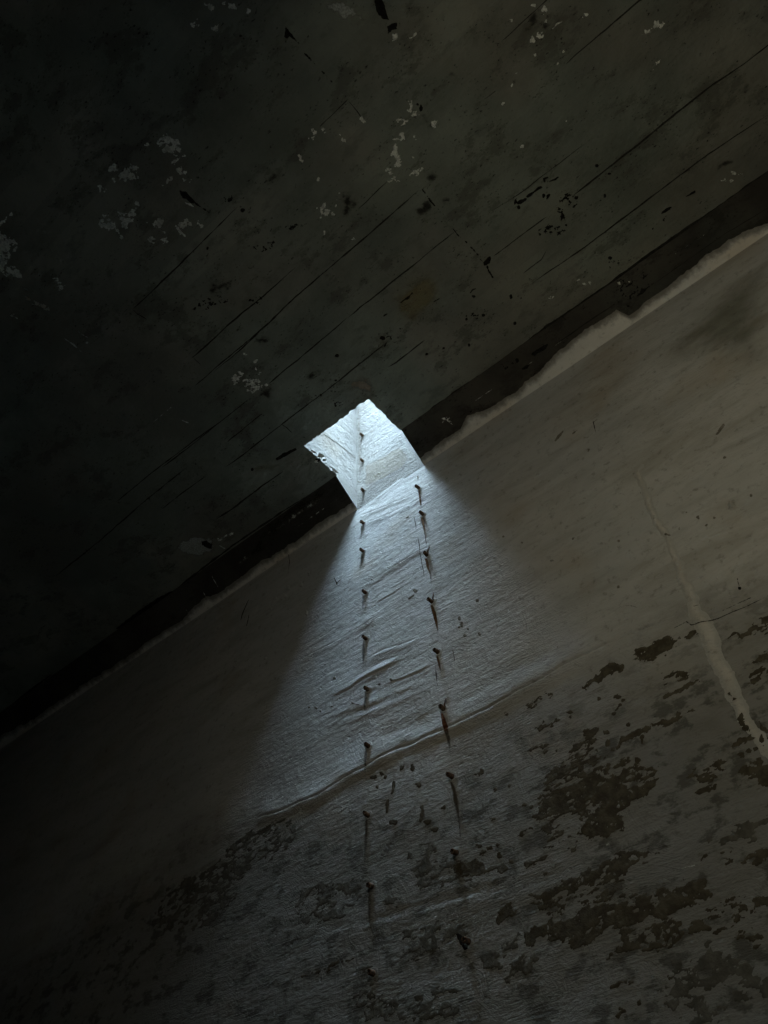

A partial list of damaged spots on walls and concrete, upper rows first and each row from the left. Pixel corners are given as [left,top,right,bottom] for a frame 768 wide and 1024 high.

crack [675,597,765,628]
peeling [582,630,700,716]
peeling [747,650,768,685]
corrosion [441,713,450,745]
peeling [686,713,768,795]
peeling [370,764,421,825]
peeling [407,709,695,890]
peeling [700,815,768,866]
peeling [480,848,768,1024]